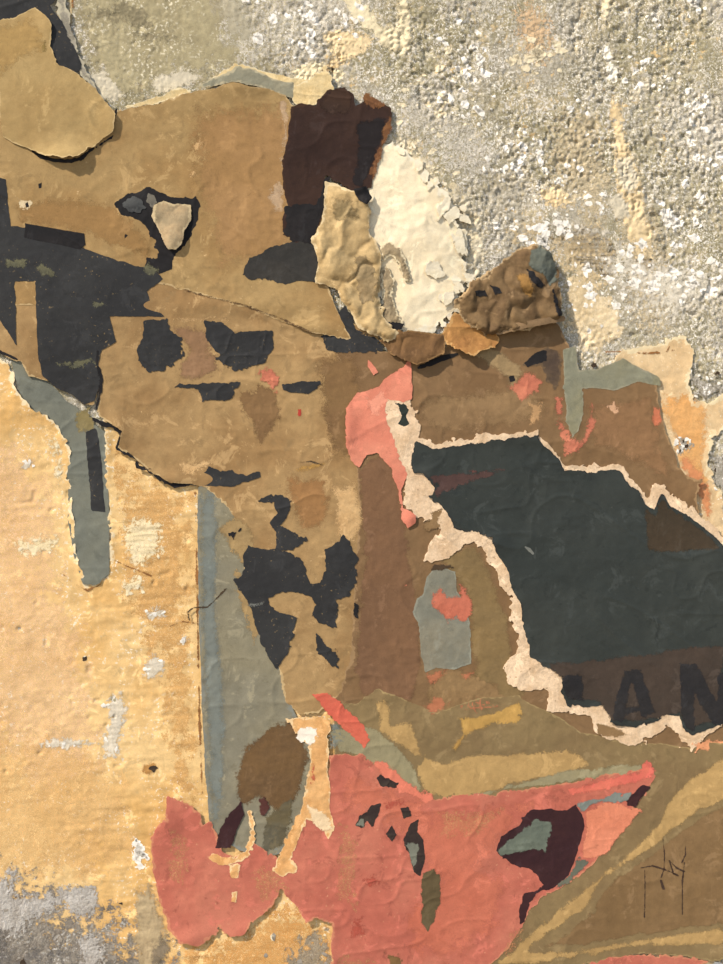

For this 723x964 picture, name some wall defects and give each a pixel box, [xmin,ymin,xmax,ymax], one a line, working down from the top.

leakage [209,0,414,84]
leakage [432,0,556,67]
leakage [601,0,616,26]
leakage [602,44,618,83]
leakage [399,69,500,188]
leakage [504,76,723,360]
leakage [660,393,712,519]